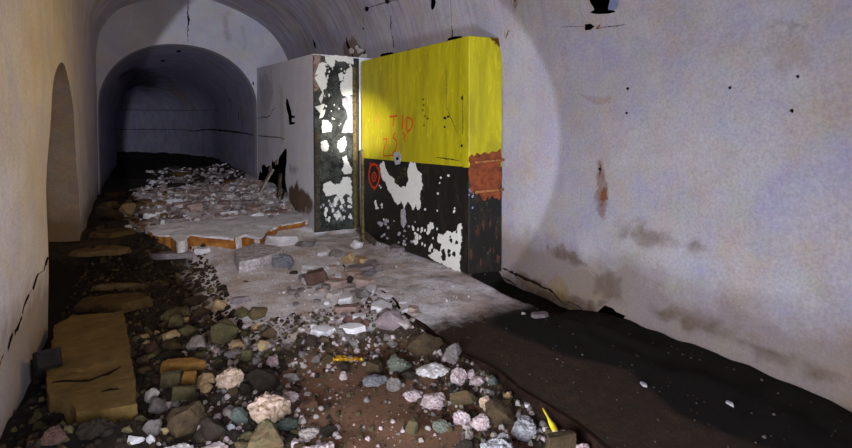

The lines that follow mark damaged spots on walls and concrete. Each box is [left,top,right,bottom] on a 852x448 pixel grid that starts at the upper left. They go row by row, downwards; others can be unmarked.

spalling [590,0,619,14]
crack [0,257,49,365]
crack [503,268,583,310]
crack [382,290,607,448]